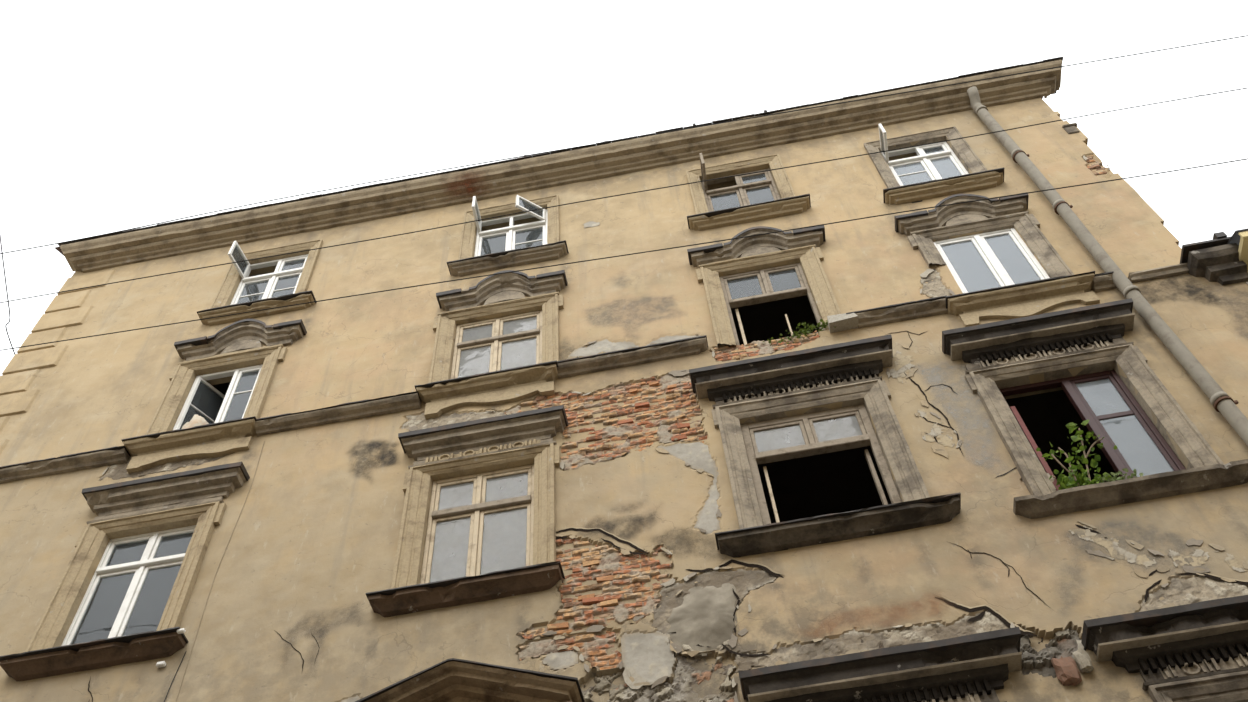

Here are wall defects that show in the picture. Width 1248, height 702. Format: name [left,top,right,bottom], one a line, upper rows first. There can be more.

flaking render [1083,155,1110,175]
flaking render [920,269,955,298]
flaking render [567,334,700,359]
flaking render [711,330,820,361]
crack [885,331,964,456]
flaking render [401,370,722,534]
flaking render [518,535,1094,702]
crack [935,542,1050,636]
flaking render [1068,520,1248,612]